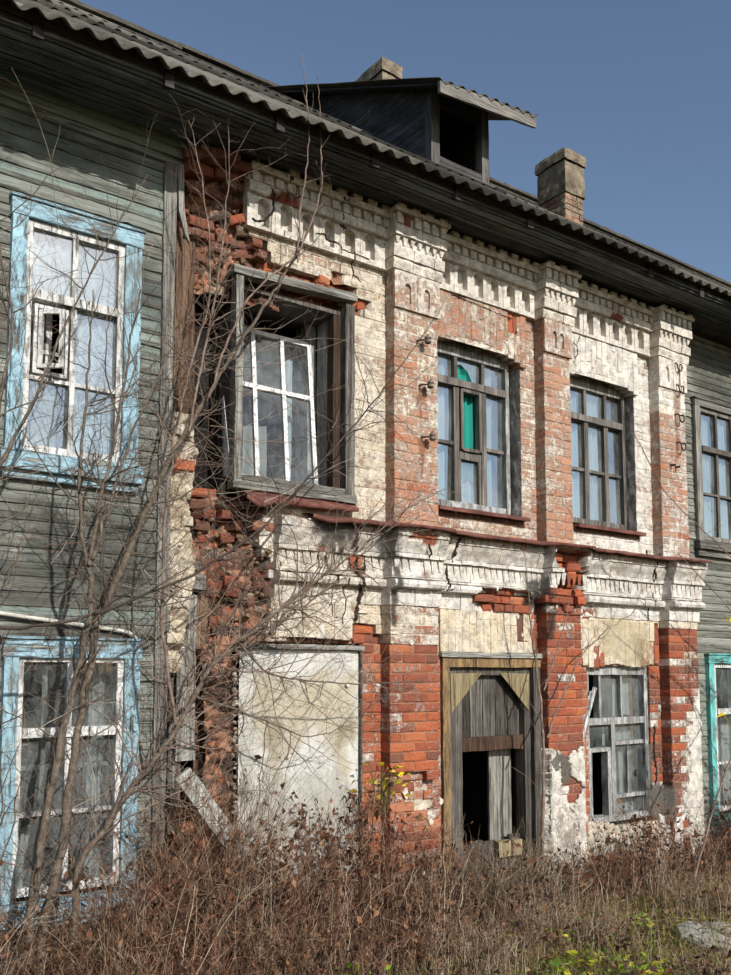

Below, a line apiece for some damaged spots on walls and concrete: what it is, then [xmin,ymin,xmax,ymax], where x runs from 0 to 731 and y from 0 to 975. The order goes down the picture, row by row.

spalling [176,146,366,316]
crack [252,176,299,223]
crack [315,196,370,282]
spalling [165,411,324,673]
crack [328,523,366,626]
crack [423,537,461,624]
peeling [338,623,443,878]
peeling [472,553,705,885]